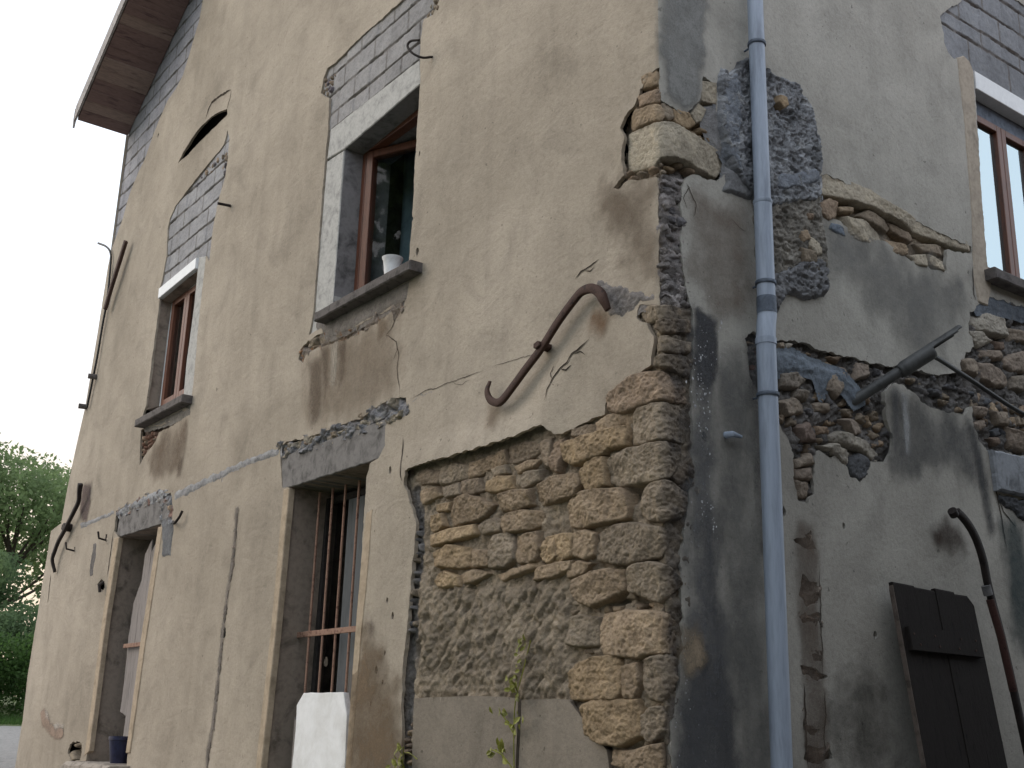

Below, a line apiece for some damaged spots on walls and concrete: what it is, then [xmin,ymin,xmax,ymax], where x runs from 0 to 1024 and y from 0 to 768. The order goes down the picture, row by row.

crack [206,90,231,116]
spalling [656,176,689,308]
flaking render [820,174,970,272]
spalling [298,281,409,362]
crack [545,337,590,397]
leakage [695,308,718,385]
spalling [276,398,409,458]
leakage [893,392,992,530]
spalling [116,489,174,557]